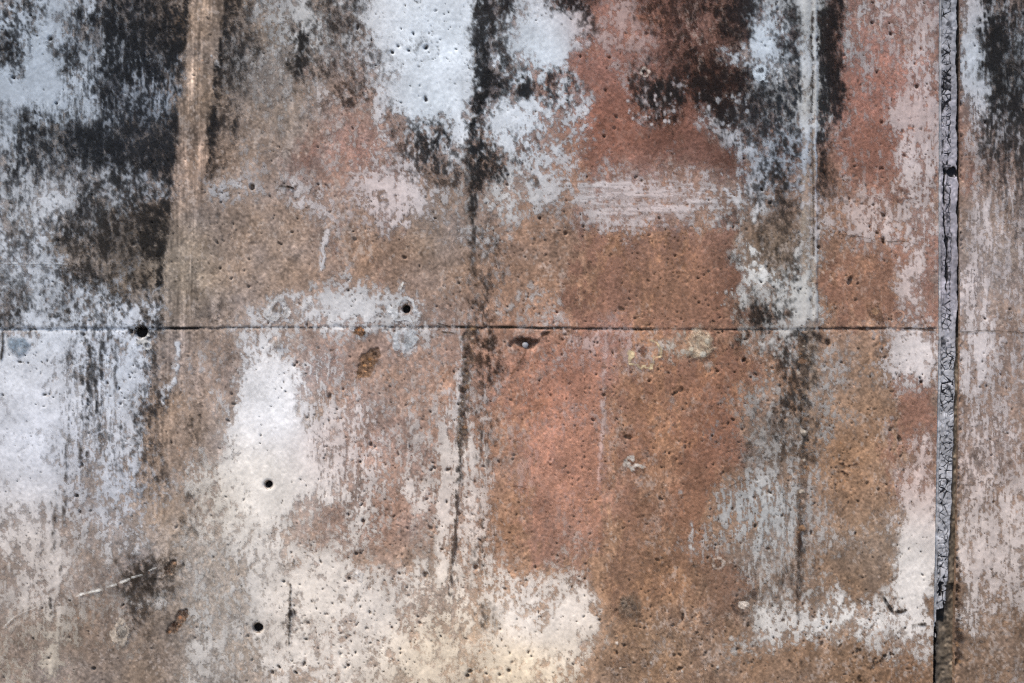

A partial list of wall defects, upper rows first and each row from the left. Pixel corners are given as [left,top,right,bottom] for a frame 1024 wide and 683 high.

water stain [0,0,190,490]
water stain [388,0,584,506]
water stain [545,0,600,38]
corrosion [510,0,750,572]
water stain [627,0,802,348]
corrosion [881,362,937,500]
crack [813,0,1024,602]
water stain [972,0,1024,211]